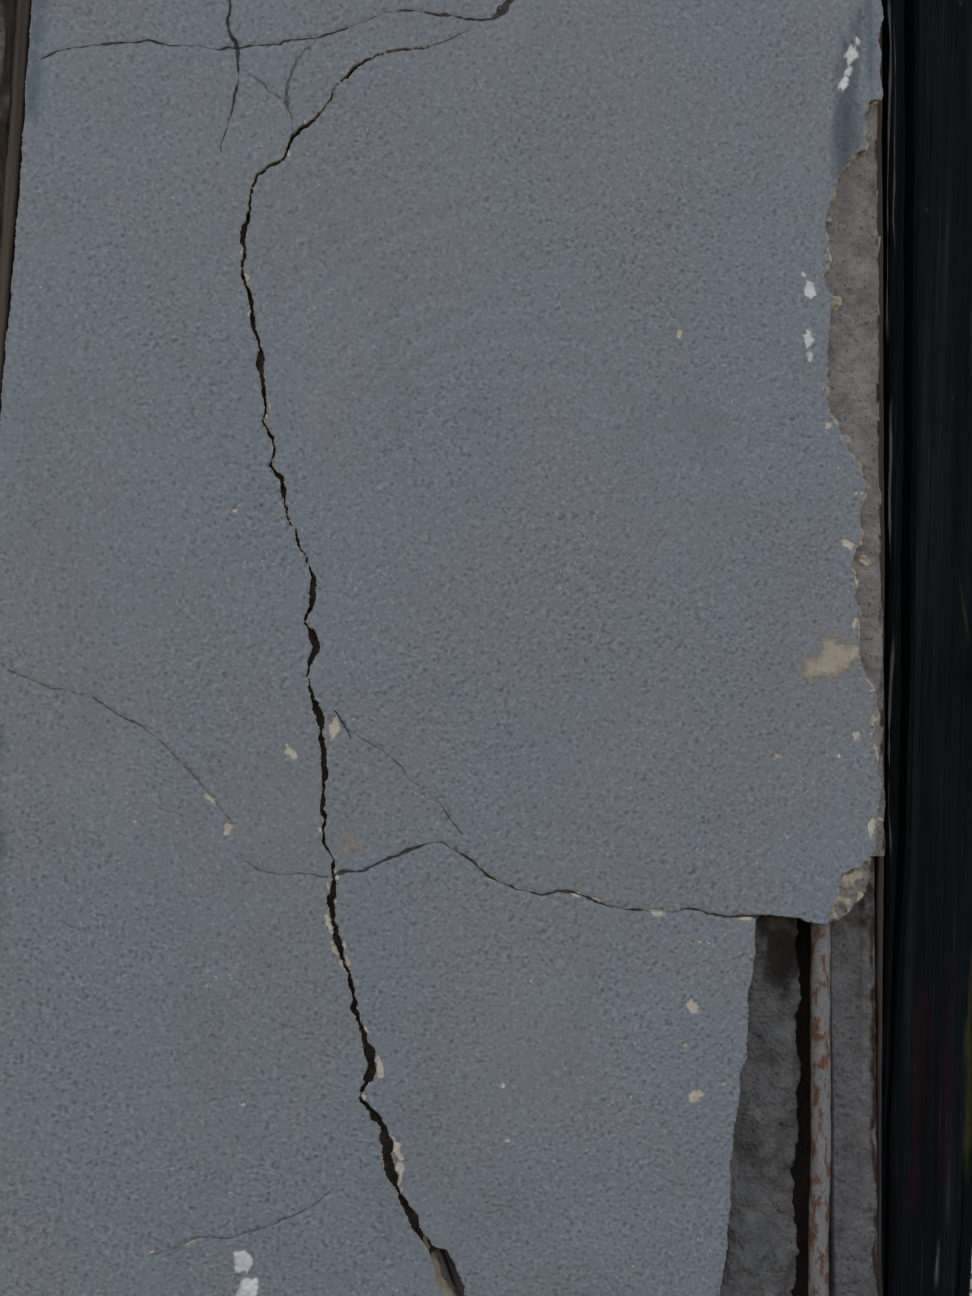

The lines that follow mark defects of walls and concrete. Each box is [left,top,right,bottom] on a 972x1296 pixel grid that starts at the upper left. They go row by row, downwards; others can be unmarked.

crack [8,0,759,1260]
spalling [821,101,886,856]
spalling [423,1235,466,1296]
spalling [686,998,699,1014]
spalling [689,1089,704,1102]
spalling [720,884,878,1296]